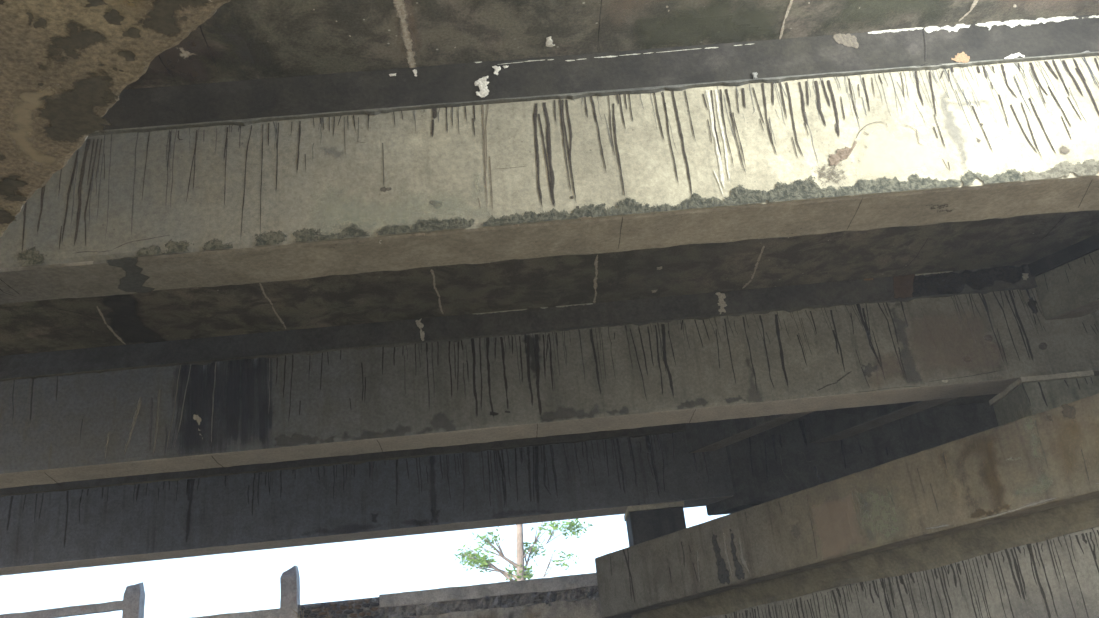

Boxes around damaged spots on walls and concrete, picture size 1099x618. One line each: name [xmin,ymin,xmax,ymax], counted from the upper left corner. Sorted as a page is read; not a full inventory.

water stain [125,32,216,89]
water stain [166,115,369,232]
water stain [431,105,493,208]
flaking render [474,65,508,98]
water stain [533,99,579,209]
water stain [582,91,696,196]
water stain [703,56,1099,196]
water stain [96,257,166,345]
water stain [382,264,1046,417]
corrosion [967,438,1009,518]
water stain [712,529,750,584]
water stain [725,528,1099,618]